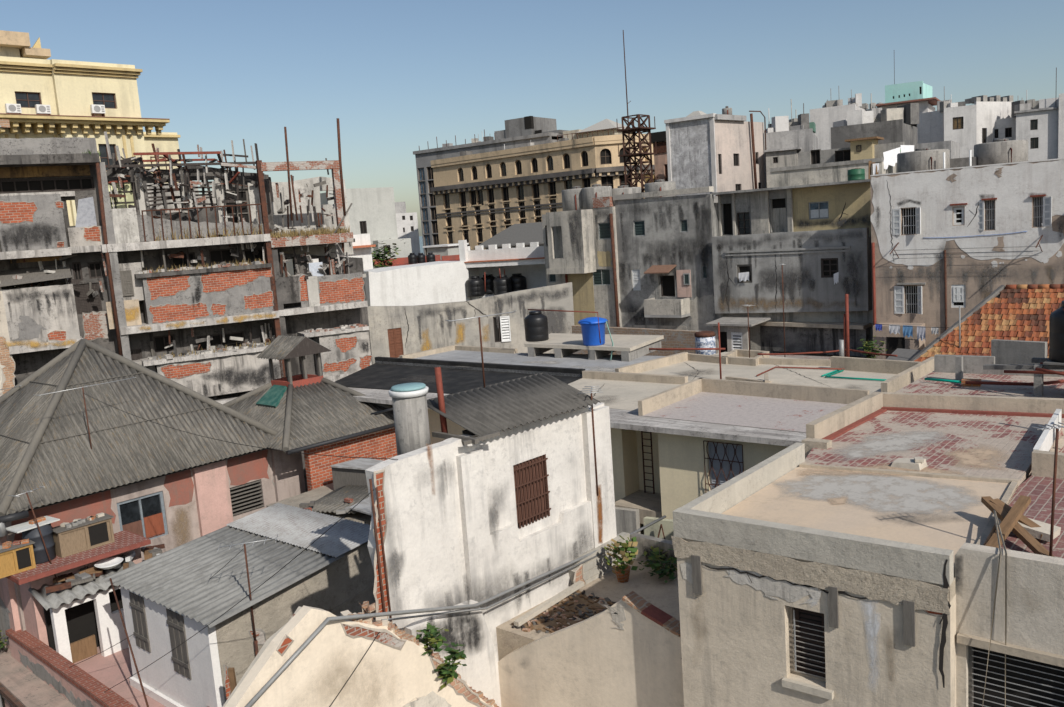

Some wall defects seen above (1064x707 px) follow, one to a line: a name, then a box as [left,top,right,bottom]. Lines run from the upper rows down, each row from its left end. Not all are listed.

flaking render [0,200,38,225]
peeling [870,159,1064,270]
leakage [703,240,822,310]
leakage [417,308,466,351]
leakage [485,291,566,339]
flaking render [0,316,67,395]
flaking render [340,469,499,707]
leakage [447,573,530,624]
peeling [719,566,822,604]